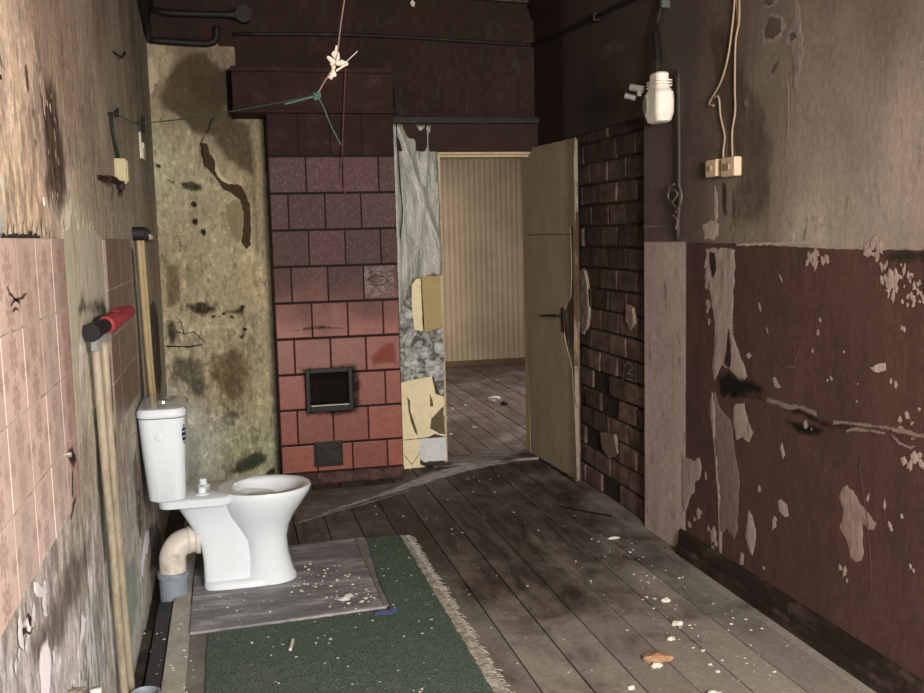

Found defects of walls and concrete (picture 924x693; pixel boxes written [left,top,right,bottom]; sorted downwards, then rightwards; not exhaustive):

water stain [45,84,66,206]
water stain [163,55,251,169]
crack [201,116,214,169]
peeling [703,187,752,381]
peeling [863,235,924,308]
spalling [871,363,898,388]
water stain [233,453,266,473]
peeling [681,391,756,565]
spalling [767,398,924,472]
peeling [838,485,876,583]
peeling [14,581,48,675]
peeling [36,640,56,693]